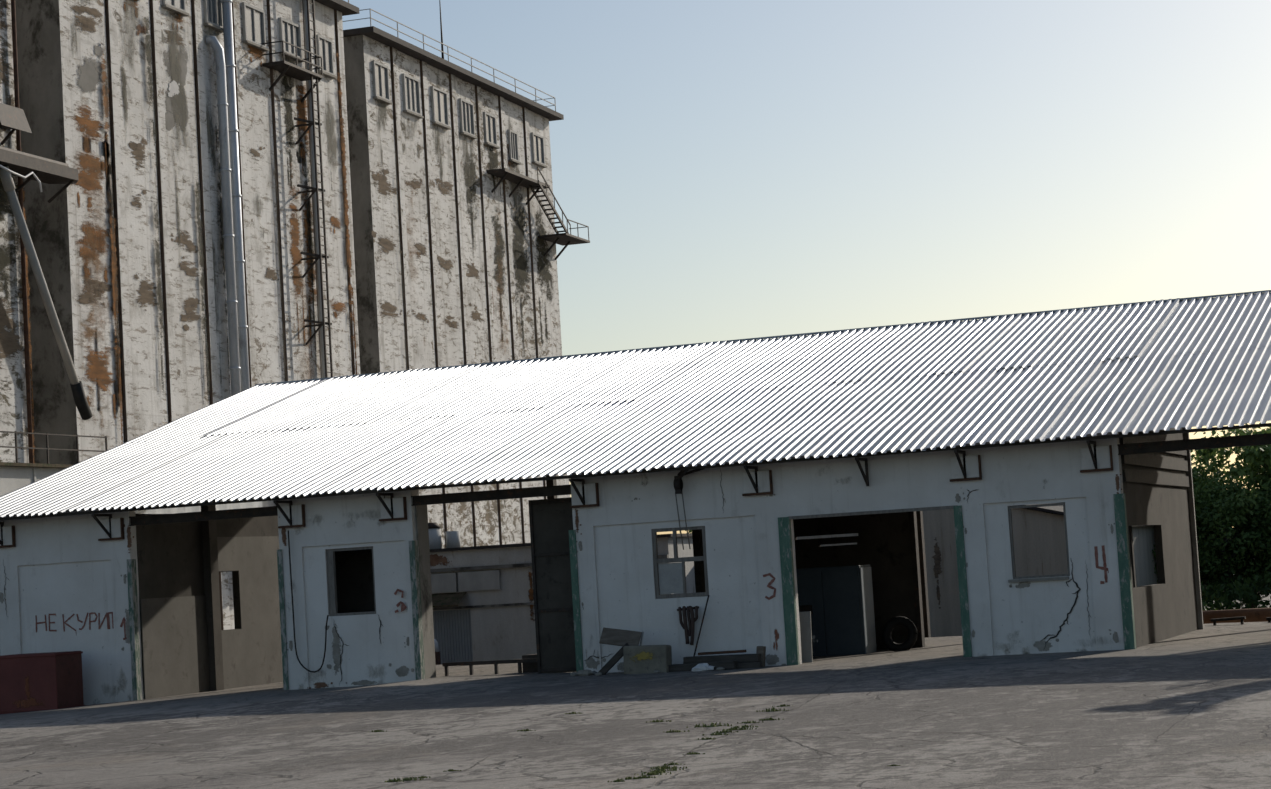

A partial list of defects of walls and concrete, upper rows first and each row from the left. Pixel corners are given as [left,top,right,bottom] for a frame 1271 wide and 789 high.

leakage [0,176,14,221]
leakage [0,240,18,299]
rust [74,43,123,444]
leakage [121,0,158,168]
leakage [169,11,187,147]
leakage [195,107,230,399]
rust [289,53,358,375]
leakage [377,101,387,129]
leakage [433,126,443,186]
leakage [460,127,553,360]
crack [1042,559,1091,649]